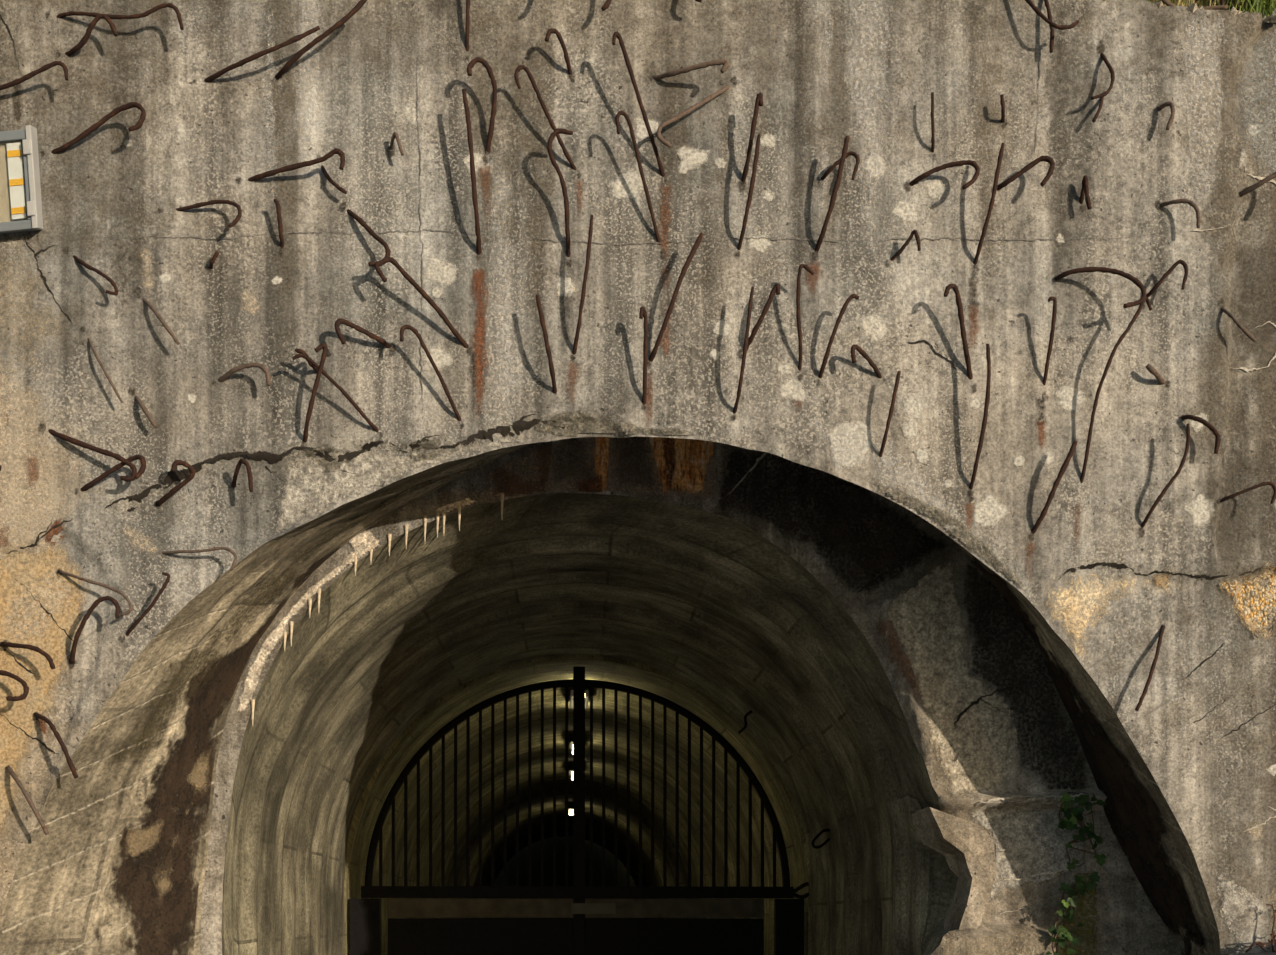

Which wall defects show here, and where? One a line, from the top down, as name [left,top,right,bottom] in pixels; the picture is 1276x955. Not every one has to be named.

corrosion [471,270,490,413]
crack [23,45,1228,514]
crack [1233,321,1276,372]
spalling [0,365,170,835]
corrosion [578,437,610,492]
corrosion [649,437,713,493]
water stain [436,436,954,593]
crack [1045,562,1276,586]
spalling [1219,563,1276,639]
water stain [109,468,472,955]
spalling [887,560,1089,903]
water stain [963,558,1205,955]